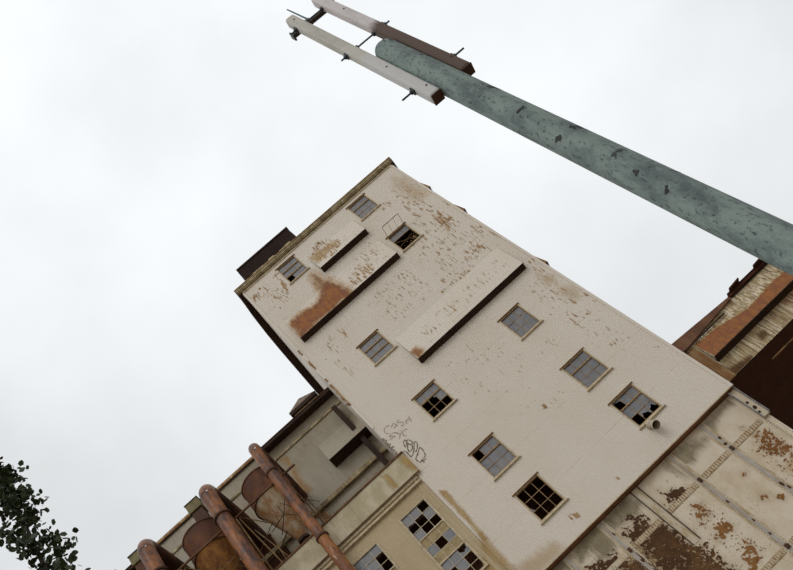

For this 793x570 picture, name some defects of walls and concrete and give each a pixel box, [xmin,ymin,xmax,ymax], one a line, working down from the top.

peeling [312,238,341,263]
peeling [349,242,390,285]
peeling [375,185,499,321]
peeling [252,273,293,309]
rust [290,274,353,338]